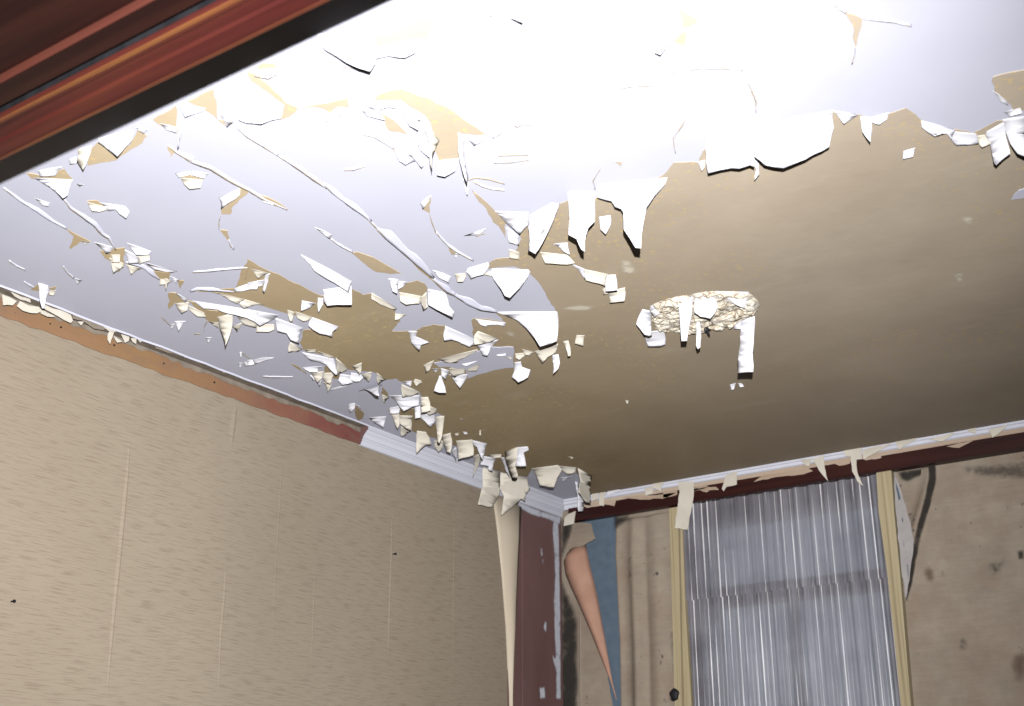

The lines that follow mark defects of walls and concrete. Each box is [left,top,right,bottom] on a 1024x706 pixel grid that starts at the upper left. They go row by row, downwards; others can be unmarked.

peeling [69,127,148,170]
peeling [153,62,349,150]
peeling [3,167,184,289]
peeling [2,283,83,325]
peeling [103,326,142,344]
peeling [168,70,1024,706]